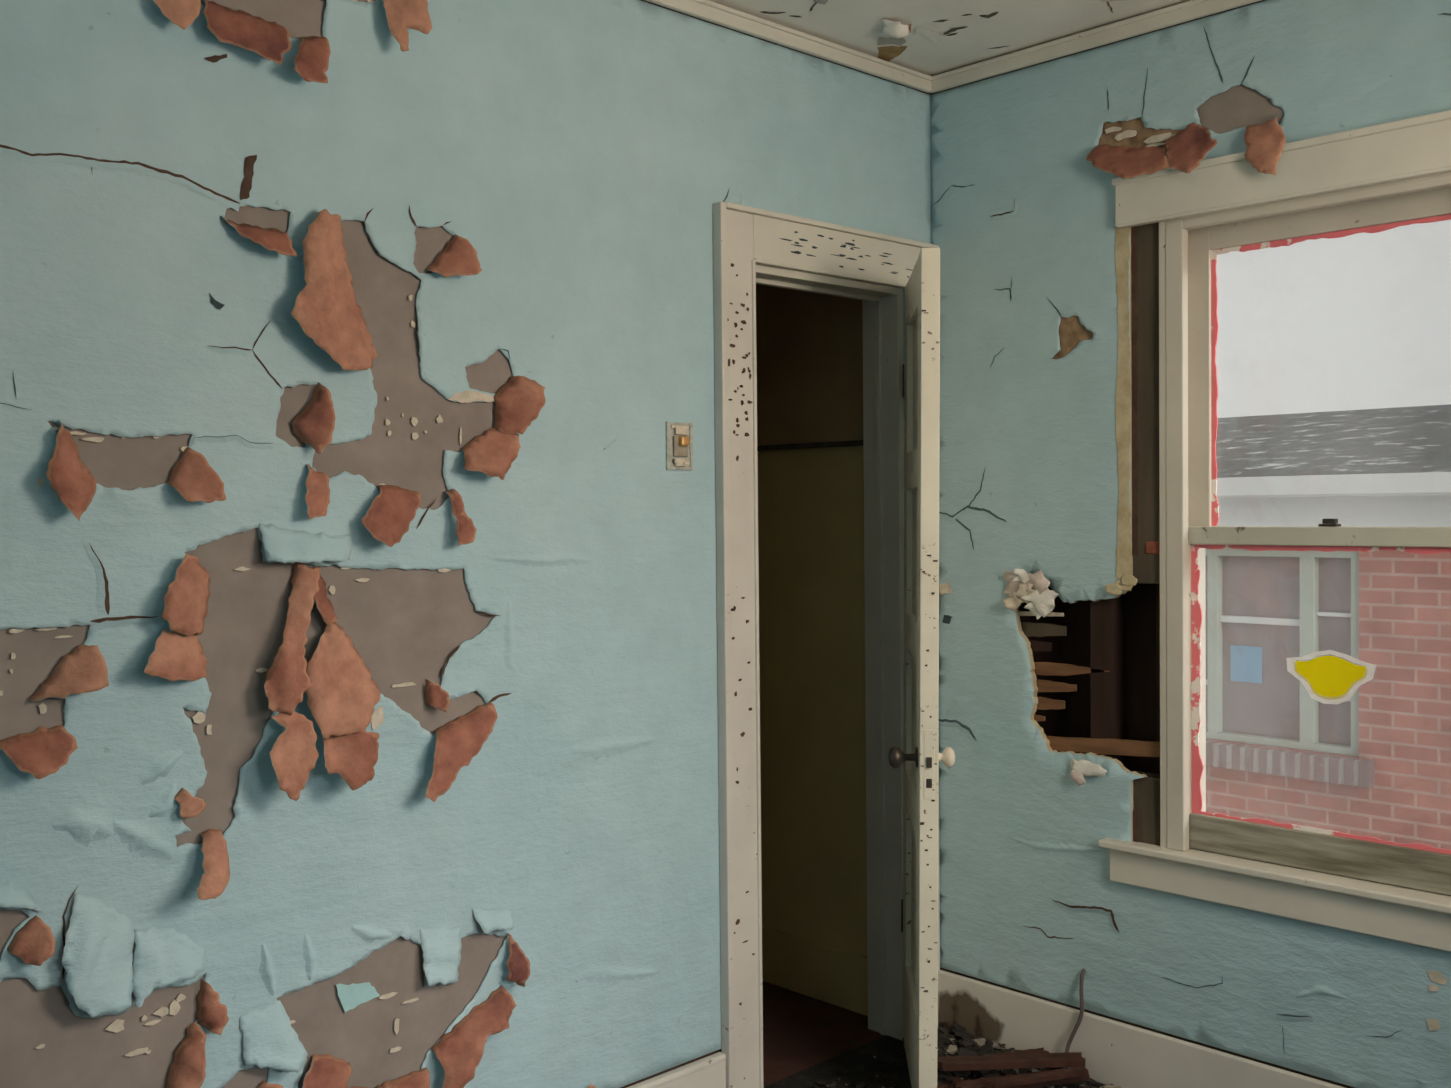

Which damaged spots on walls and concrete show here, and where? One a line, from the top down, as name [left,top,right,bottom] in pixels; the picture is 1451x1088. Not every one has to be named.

peeling [153,0,331,84]
peeling [352,0,432,52]
peeling [1086,28,1286,179]
crack [0,144,240,211]
peeling [37,419,226,521]
peeling [144,155,546,900]
crack [939,469,1007,549]
spalling [1003,226,1160,841]
peeling [0,625,109,780]
crack [1023,900,1119,939]
peeling [0,881,530,1088]